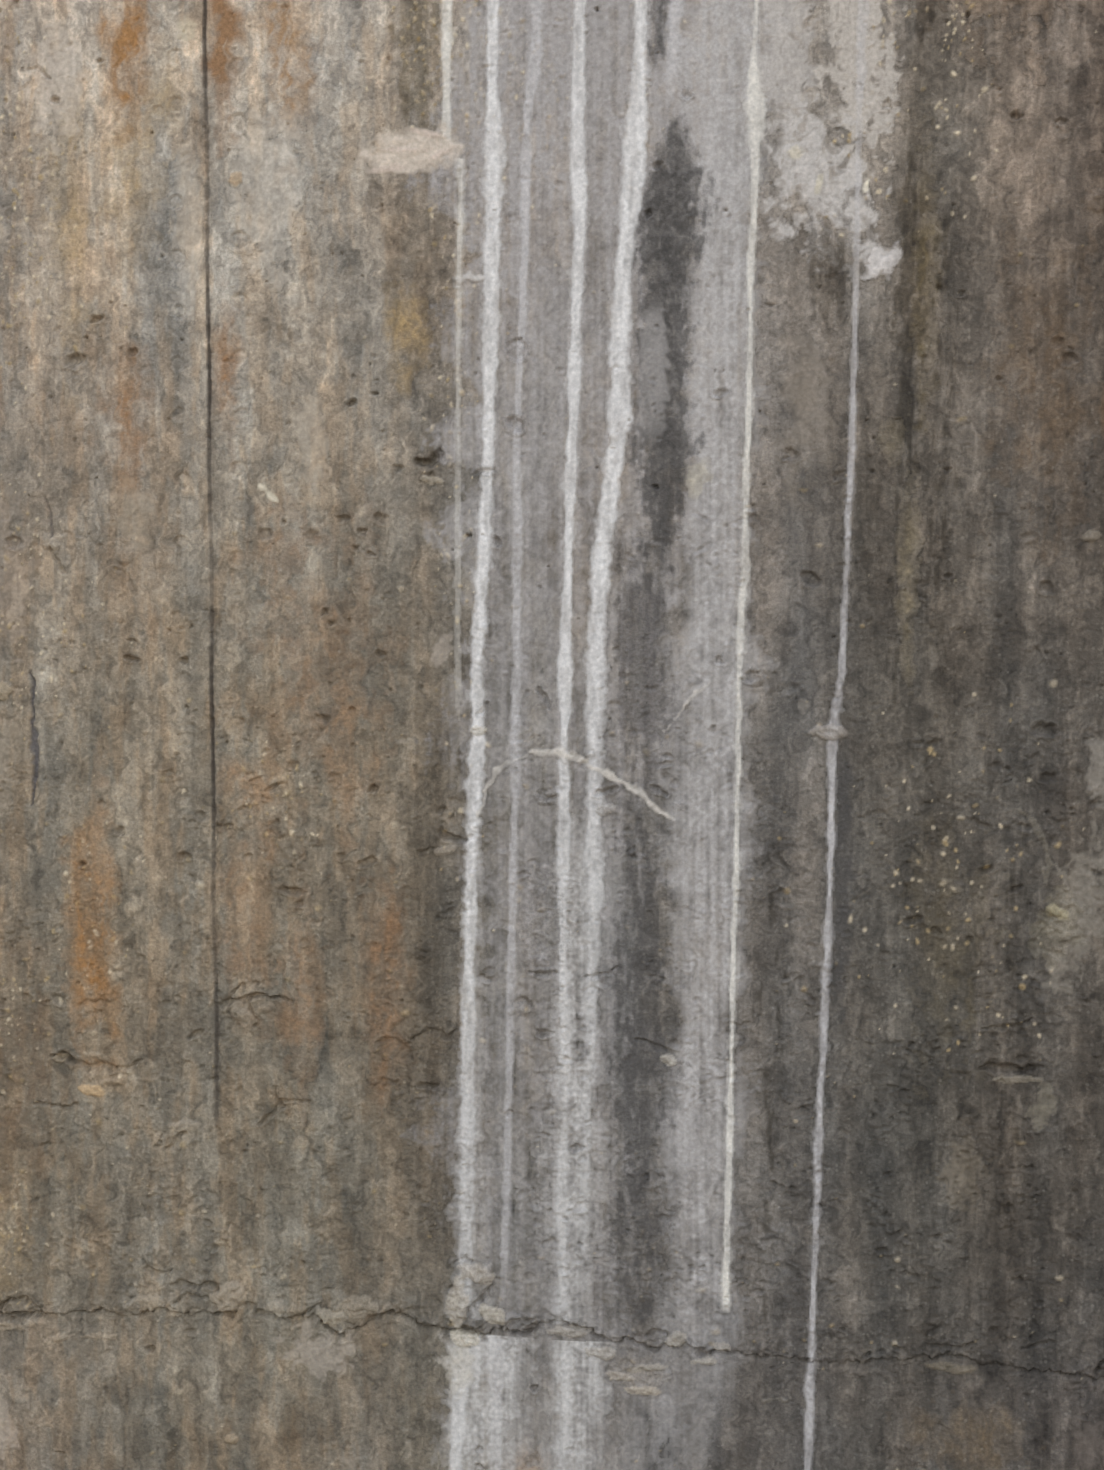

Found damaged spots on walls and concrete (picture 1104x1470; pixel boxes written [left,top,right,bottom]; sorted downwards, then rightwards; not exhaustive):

rust [39,0,171,492]
spalling [354,119,467,180]
water stain [358,0,980,1470]
rust [56,741,129,1084]
crack [366,1036,401,1090]
crack [0,1243,1104,1391]